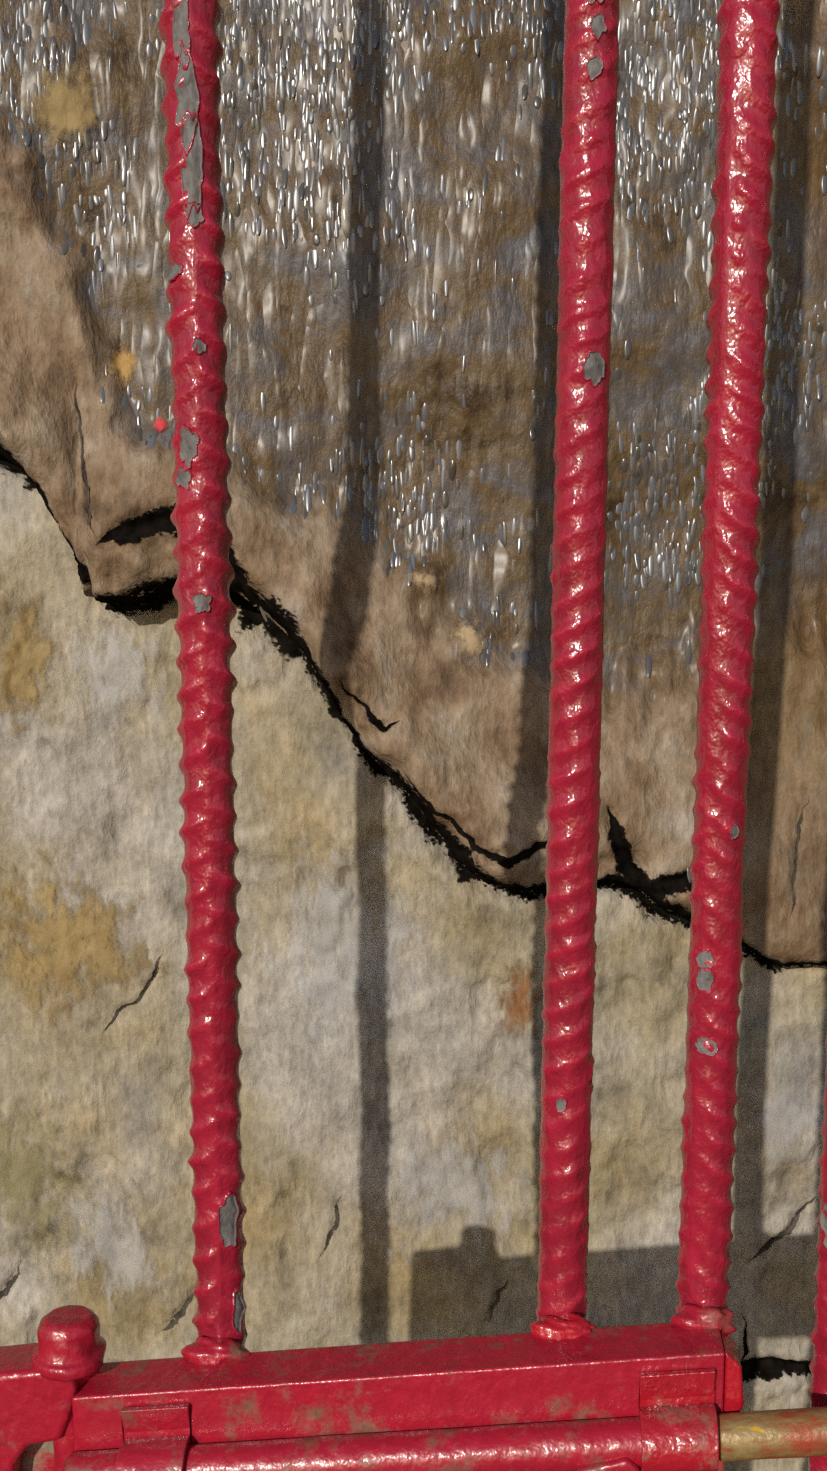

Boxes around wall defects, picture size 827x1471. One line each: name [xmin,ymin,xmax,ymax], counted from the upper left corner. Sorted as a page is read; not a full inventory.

leakage [0,0,140,299]
leakage [146,9,160,58]
leakage [217,0,565,318]
leakage [616,0,720,273]
leakage [777,0,827,139]
leakage [100,349,175,450]
leakage [233,388,522,586]
leakage [375,280,449,348]
leakage [604,373,710,611]
leakage [759,218,827,509]
leakage [477,595,551,679]
crack [101,950,163,1035]